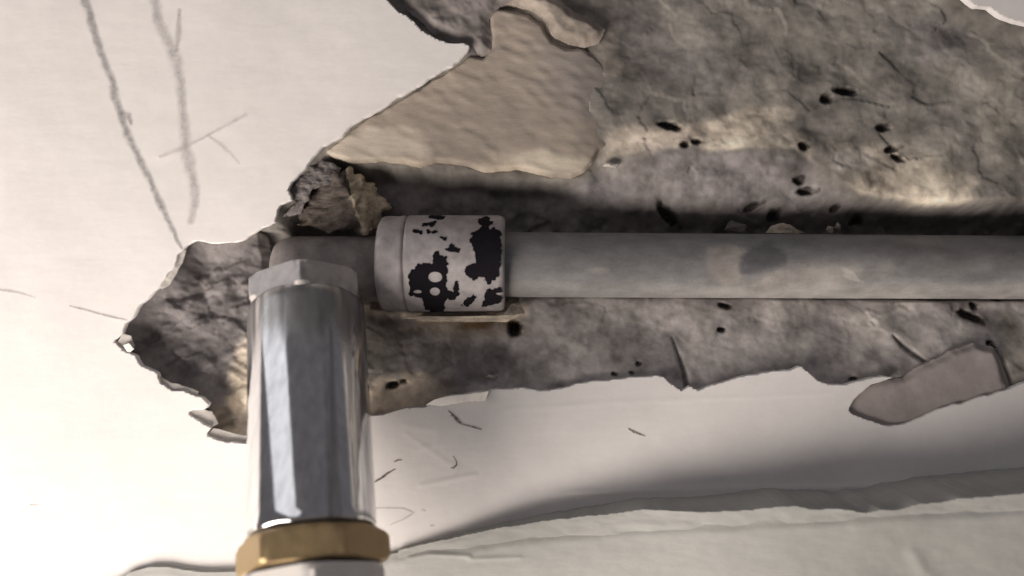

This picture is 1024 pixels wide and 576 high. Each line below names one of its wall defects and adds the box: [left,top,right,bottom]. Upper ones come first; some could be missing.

flaking render [118,0,1024,443]